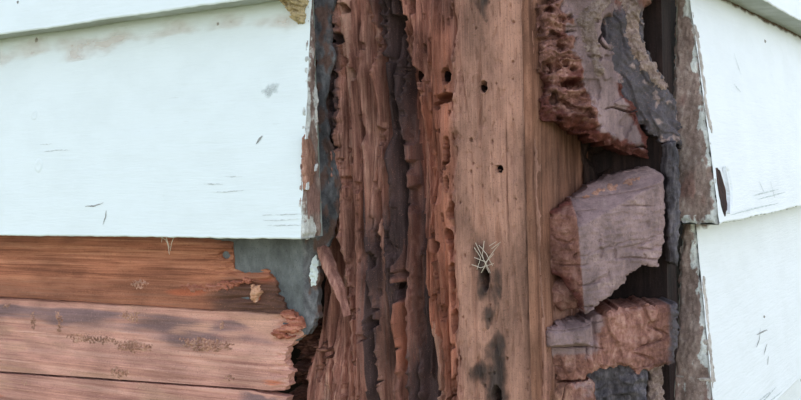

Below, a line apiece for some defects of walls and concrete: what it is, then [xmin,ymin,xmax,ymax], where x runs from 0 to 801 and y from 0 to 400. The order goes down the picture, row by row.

peeling [692,24,713,133]
peeling [301,129,318,191]